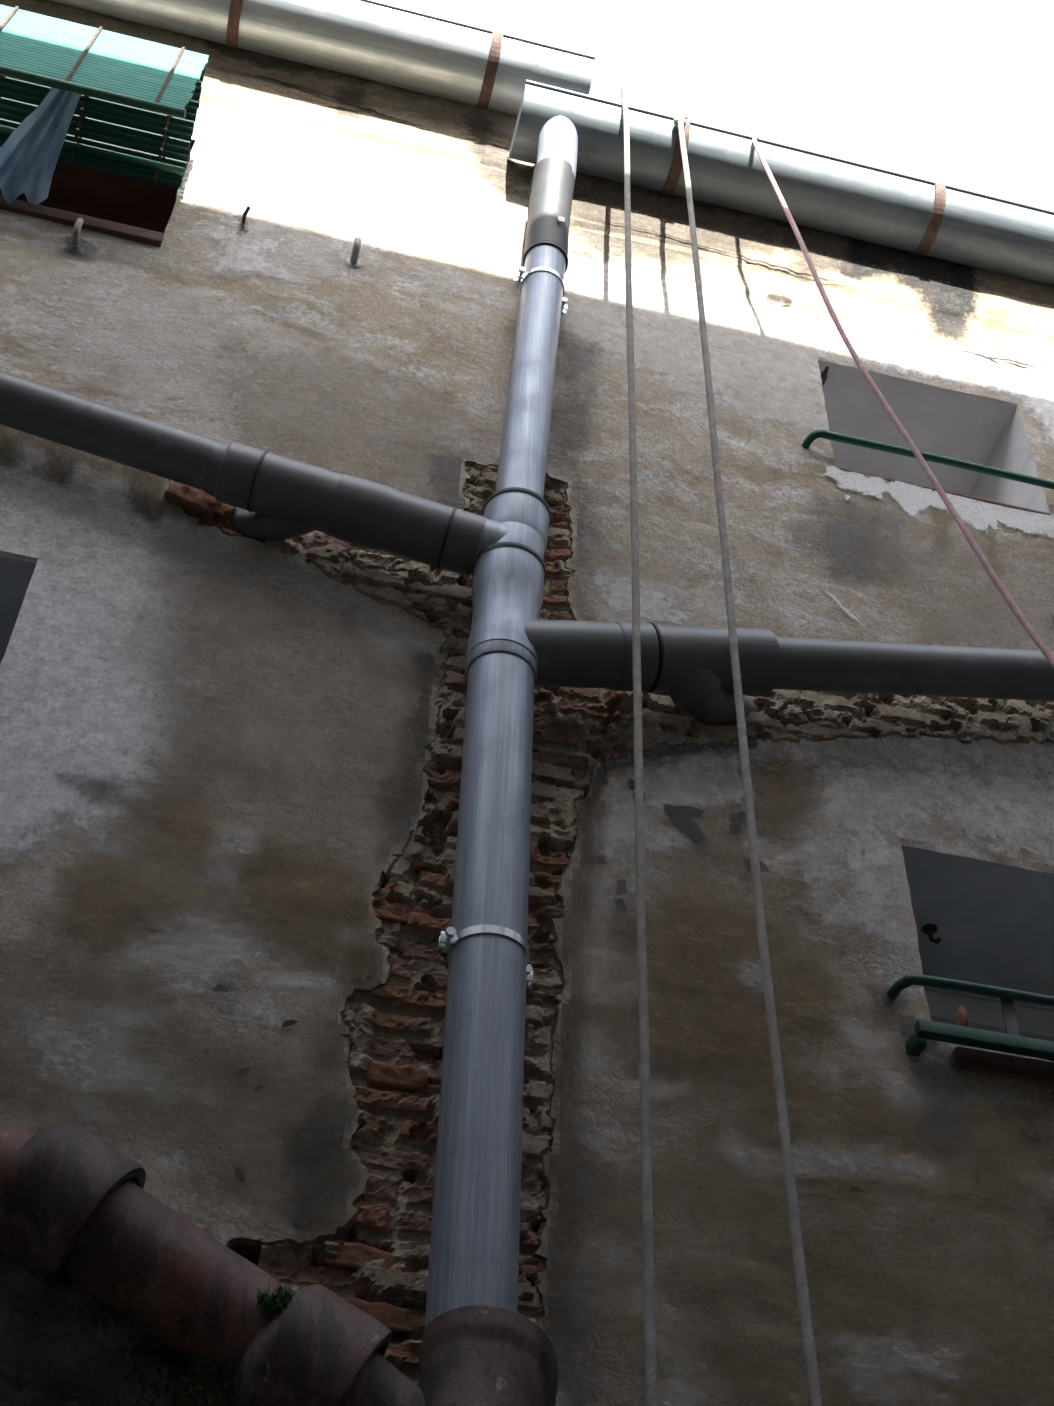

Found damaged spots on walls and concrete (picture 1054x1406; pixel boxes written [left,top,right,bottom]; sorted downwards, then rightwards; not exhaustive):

leakage [568,172,1054,362]
leakage [0,424,165,521]
spalling [463,466,498,516]
spalling [539,477,575,621]
peeling [824,464,1054,538]
leakage [0,927,383,1211]
spalling [163,480,473,1386]
spalling [518,685,1054,1321]
leakage [546,790,1054,1406]